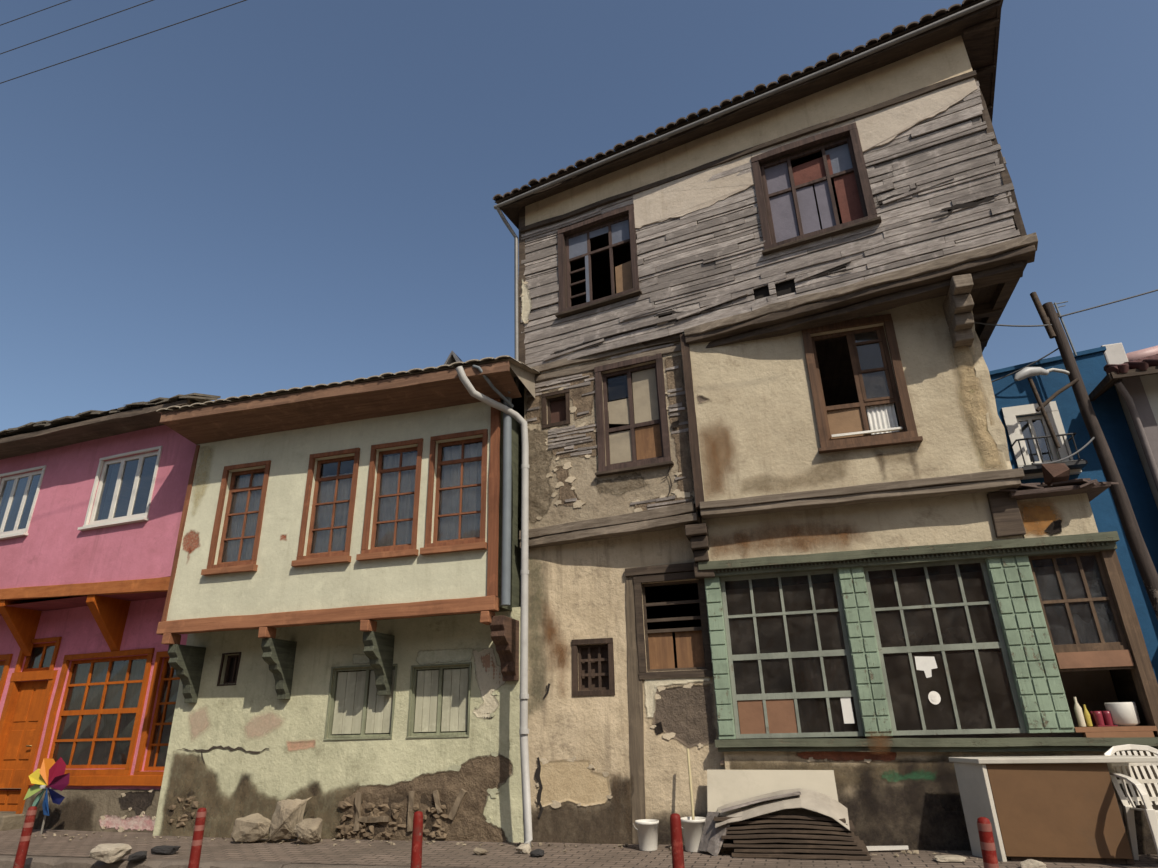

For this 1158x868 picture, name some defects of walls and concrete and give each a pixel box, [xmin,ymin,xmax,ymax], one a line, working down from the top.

flaking render [526,343,710,523]
flaking render [1045,520,1062,535]
flaking render [644,677,716,748]
crack [178,745,269,764]
flaking render [535,756,613,808]
peeling [99,789,156,832]